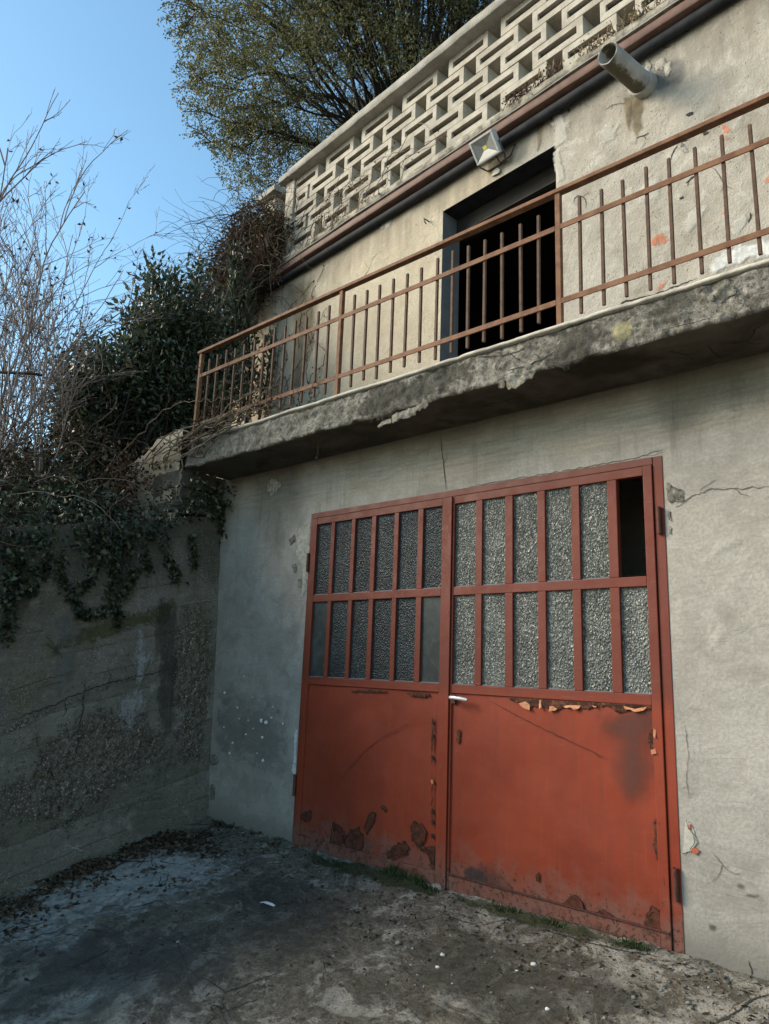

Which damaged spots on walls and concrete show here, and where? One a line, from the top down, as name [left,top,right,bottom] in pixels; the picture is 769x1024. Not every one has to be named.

water stain [624,95,643,133]
spalling [613,322,632,339]
spalling [498,363,534,390]
spalling [377,402,428,428]
crack [440,432,662,489]
crack [677,480,766,507]
crack [2,636,174,756]
peeling [509,698,652,714]